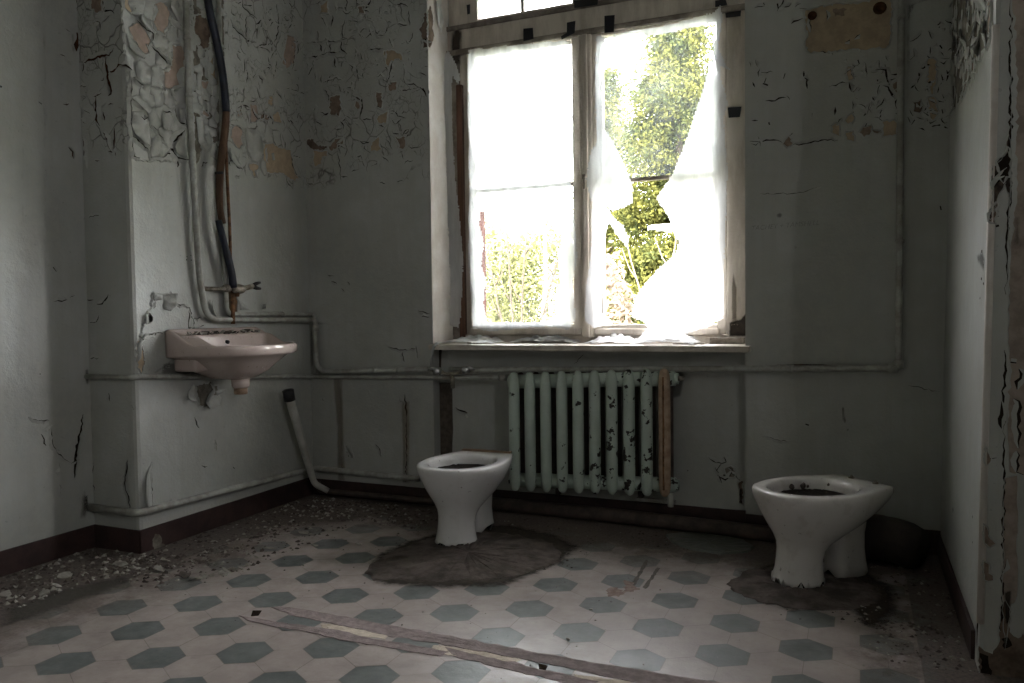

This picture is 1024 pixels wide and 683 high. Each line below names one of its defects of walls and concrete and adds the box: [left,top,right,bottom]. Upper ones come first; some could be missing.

peeling [90,0,265,179]
peeling [803,0,897,109]
peeling [948,0,993,116]
peeling [306,91,406,181]
peeling [135,291,261,374]
peeling [977,0,1024,679]
peeling [188,380,225,428]
crack [28,414,95,499]
crack [122,460,153,517]